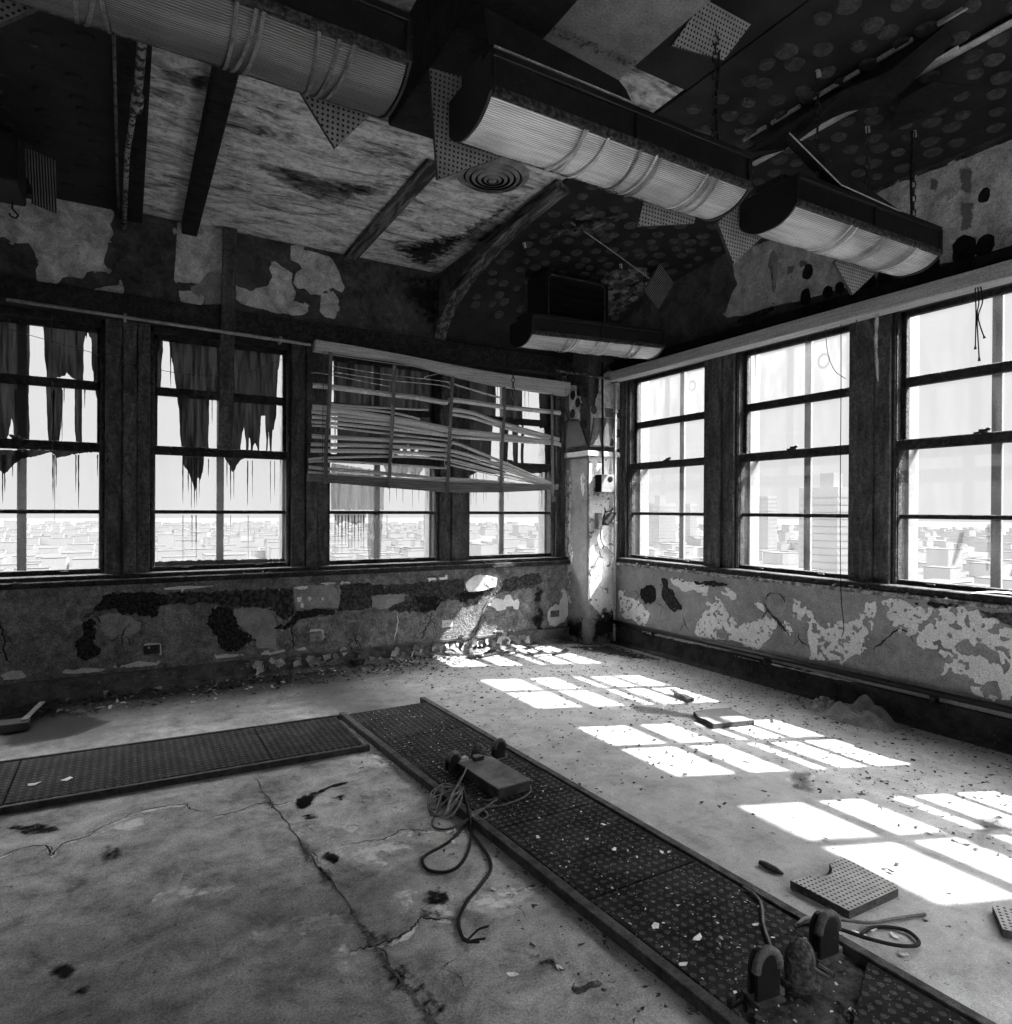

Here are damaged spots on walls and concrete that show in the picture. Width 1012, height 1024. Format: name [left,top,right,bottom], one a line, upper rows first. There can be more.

damp [259,164,386,203]
peeling [0,198,124,294]
peeling [173,222,223,305]
peeling [236,244,345,319]
peeling [548,370,1012,701]
flaking render [63,572,543,675]
crack [0,776,449,1024]